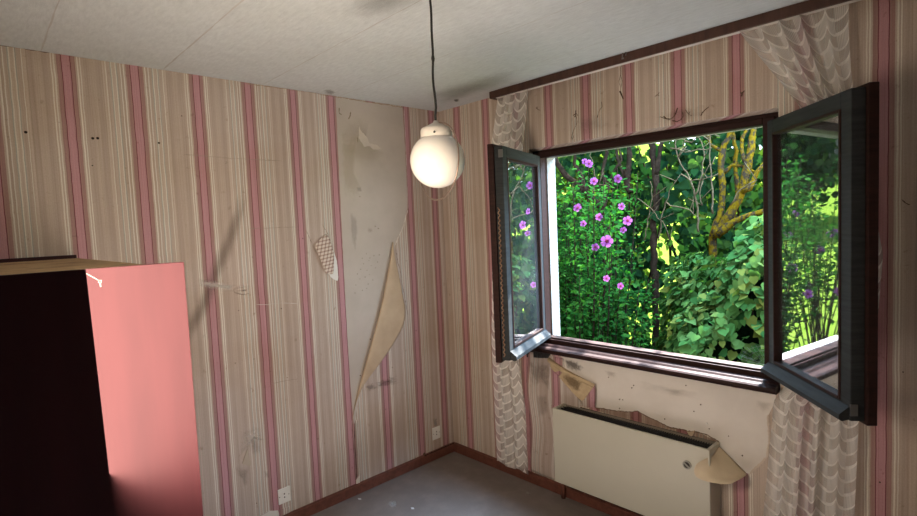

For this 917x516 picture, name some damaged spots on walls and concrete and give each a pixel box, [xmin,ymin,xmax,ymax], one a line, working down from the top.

flaking render [336,97,407,423]
flaking render [550,355,776,474]